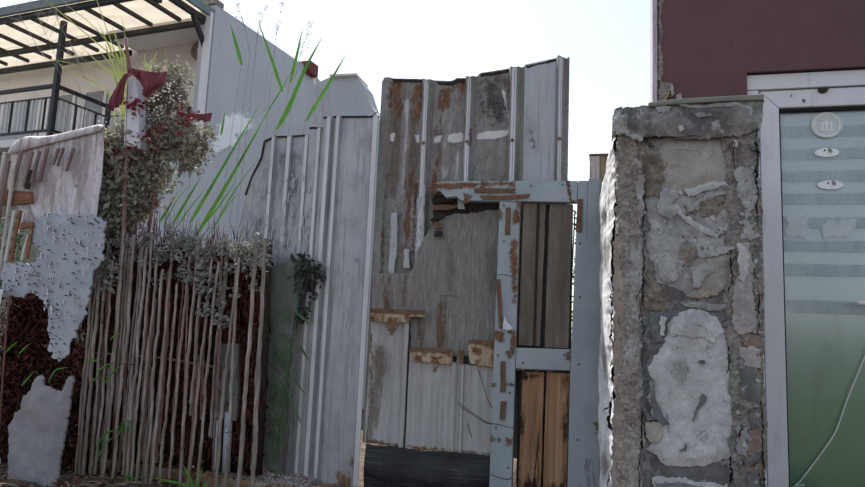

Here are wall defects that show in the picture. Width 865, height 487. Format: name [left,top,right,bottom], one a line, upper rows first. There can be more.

corrosion [386,82,423,252]
corrosion [429,76,515,204]
corrosion [366,336,398,446]
corrosion [384,278,451,372]
corrosion [472,330,516,364]
corrosion [509,240,519,303]
crack [603,397,613,432]
crack [608,251,616,367]
crack [636,187,648,368]
flaking render [609,0,765,487]